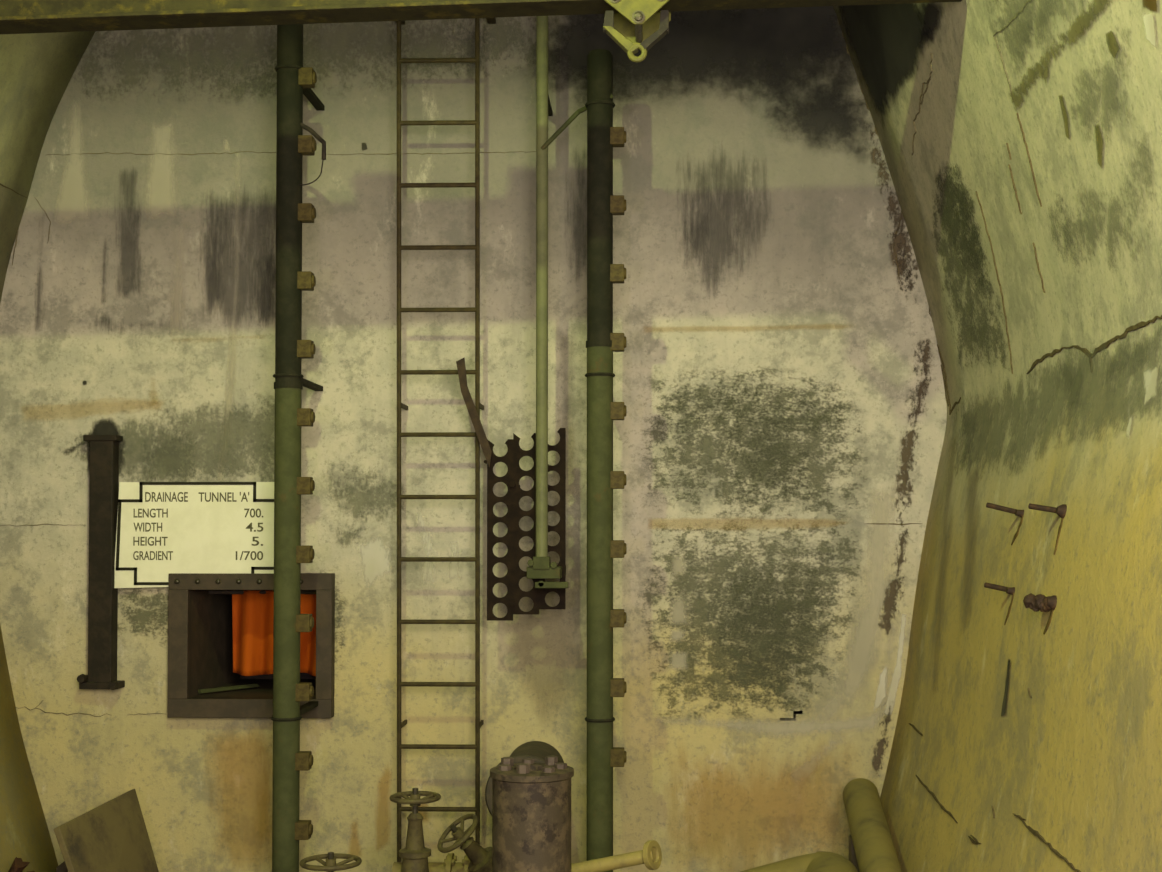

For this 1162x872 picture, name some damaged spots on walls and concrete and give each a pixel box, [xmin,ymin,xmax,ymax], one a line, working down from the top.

mould [932,166,1005,367]
crack [975,191,1162,374]
mould [1053,195,1131,261]
mould [956,327,1162,470]
leakage [645,370,888,744]
rust [1004,592,1054,635]
crack [916,775,1081,872]